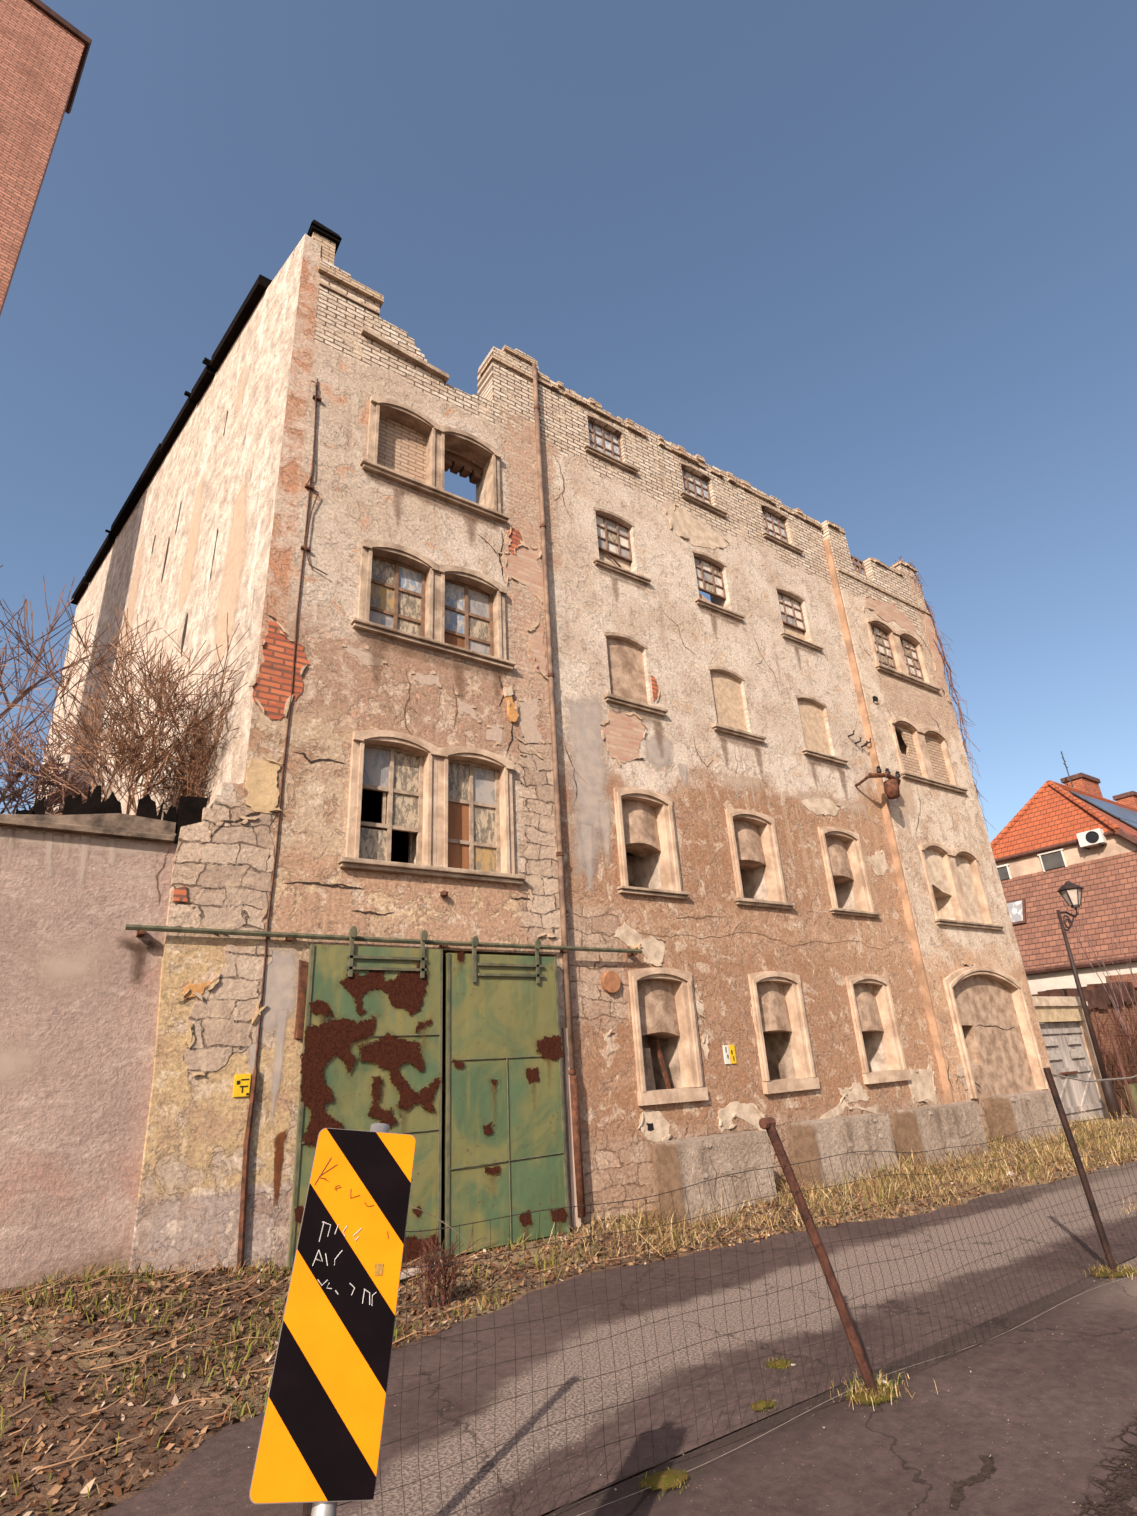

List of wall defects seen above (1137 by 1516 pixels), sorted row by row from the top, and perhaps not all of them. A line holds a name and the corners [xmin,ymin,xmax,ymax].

spalling [249,621,310,720]
spalling [651,675,660,701]
spalling [600,711,648,767]
spalling [173,806,282,1077]
rust [273,964,441,1205]
rust [526,1035,563,1084]
rust [294,1206,304,1223]